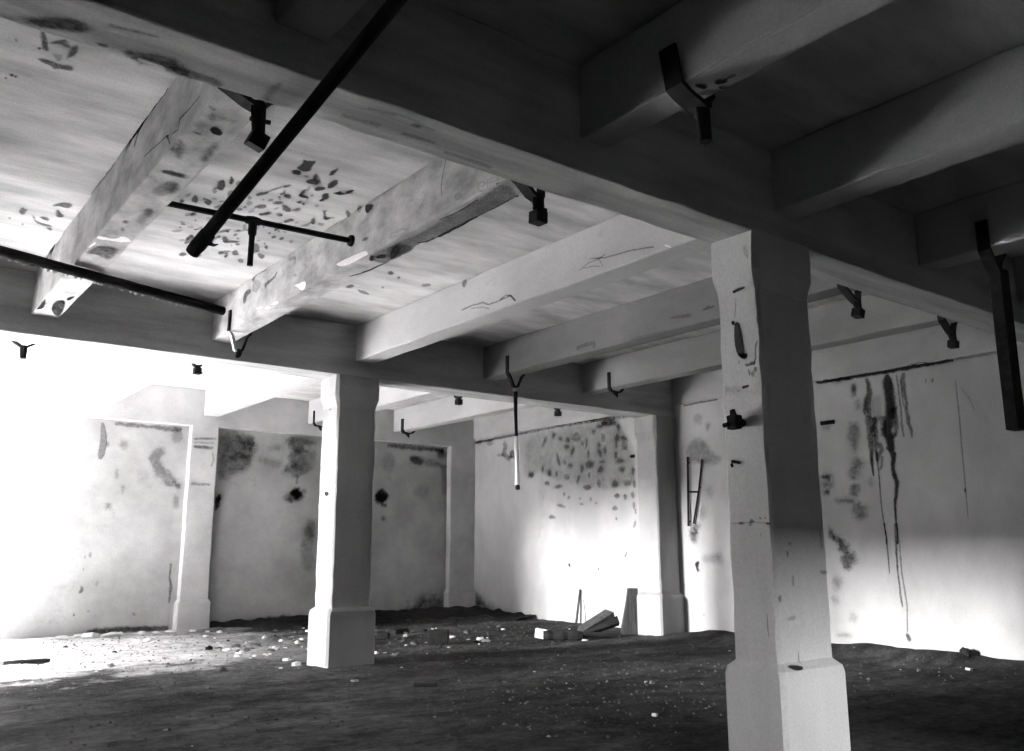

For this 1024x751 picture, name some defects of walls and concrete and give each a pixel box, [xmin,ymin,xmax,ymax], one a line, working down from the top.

peeling [38,32,77,70]
peeling [180,177,240,256]
peeling [218,160,354,263]
damp [218,435,253,477]
damp [529,433,602,518]
damp [590,416,636,519]
damp [863,373,913,617]
damp [829,530,855,568]